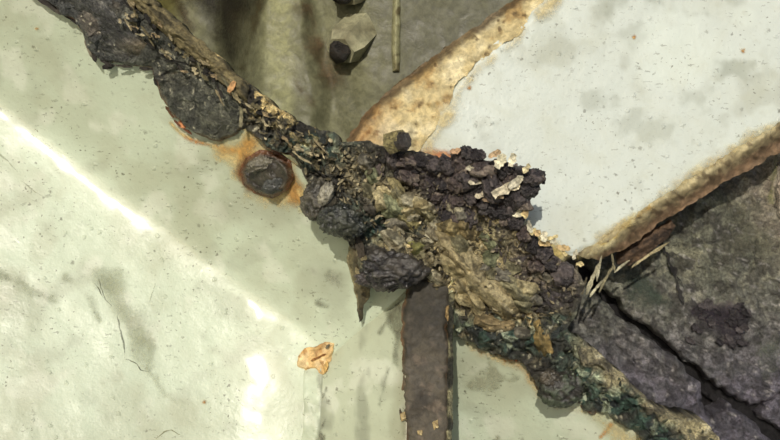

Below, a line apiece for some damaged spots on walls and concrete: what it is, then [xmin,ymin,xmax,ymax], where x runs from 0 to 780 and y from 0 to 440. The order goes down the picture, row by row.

corrosion [38,0,270,135]
corrosion [194,0,720,440]
peeling [465,149,531,204]
corrosion [578,122,780,260]
crack [578,265,780,440]